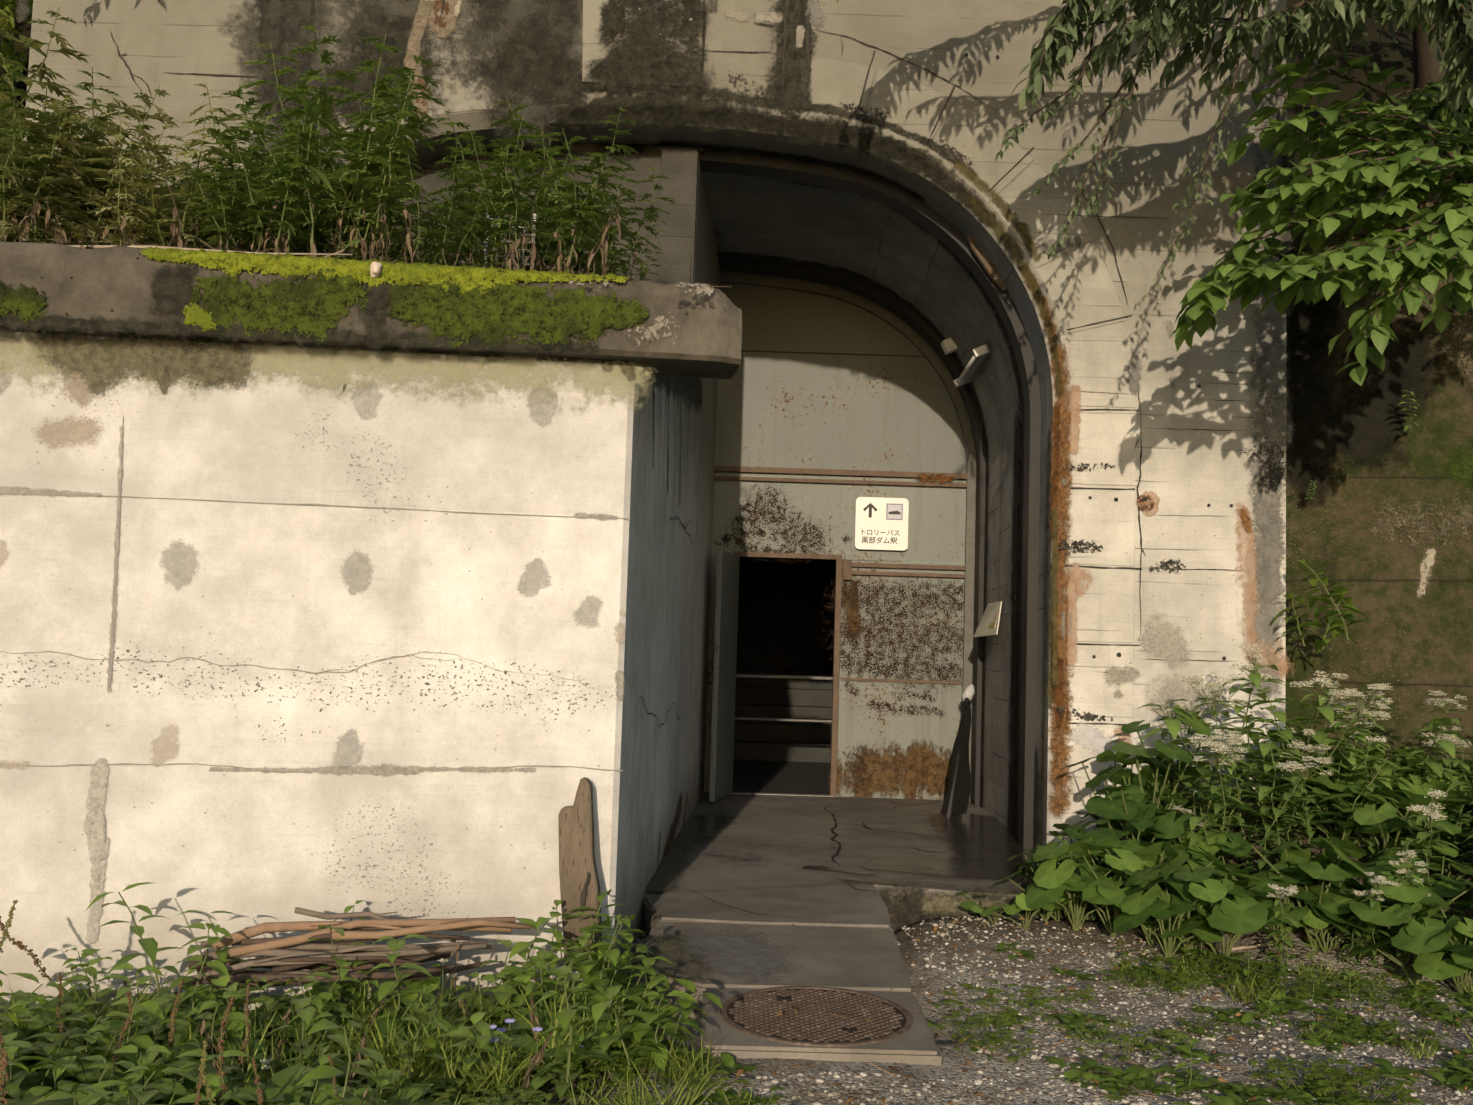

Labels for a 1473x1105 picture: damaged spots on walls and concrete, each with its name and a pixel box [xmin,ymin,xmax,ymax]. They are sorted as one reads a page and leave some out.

damp [228,0,729,170]
damp [767,0,823,118]
damp [1250,60,1295,265]
damp [675,282,714,303]
damp [0,487,102,497]
damp [0,312,703,493]
damp [771,178,1091,917]
corrosion [1021,264,1081,817]
corrosion [1236,503,1288,677]
damp [1243,276,1446,698]
crack [824,800,956,892]
corrosion [829,741,952,799]